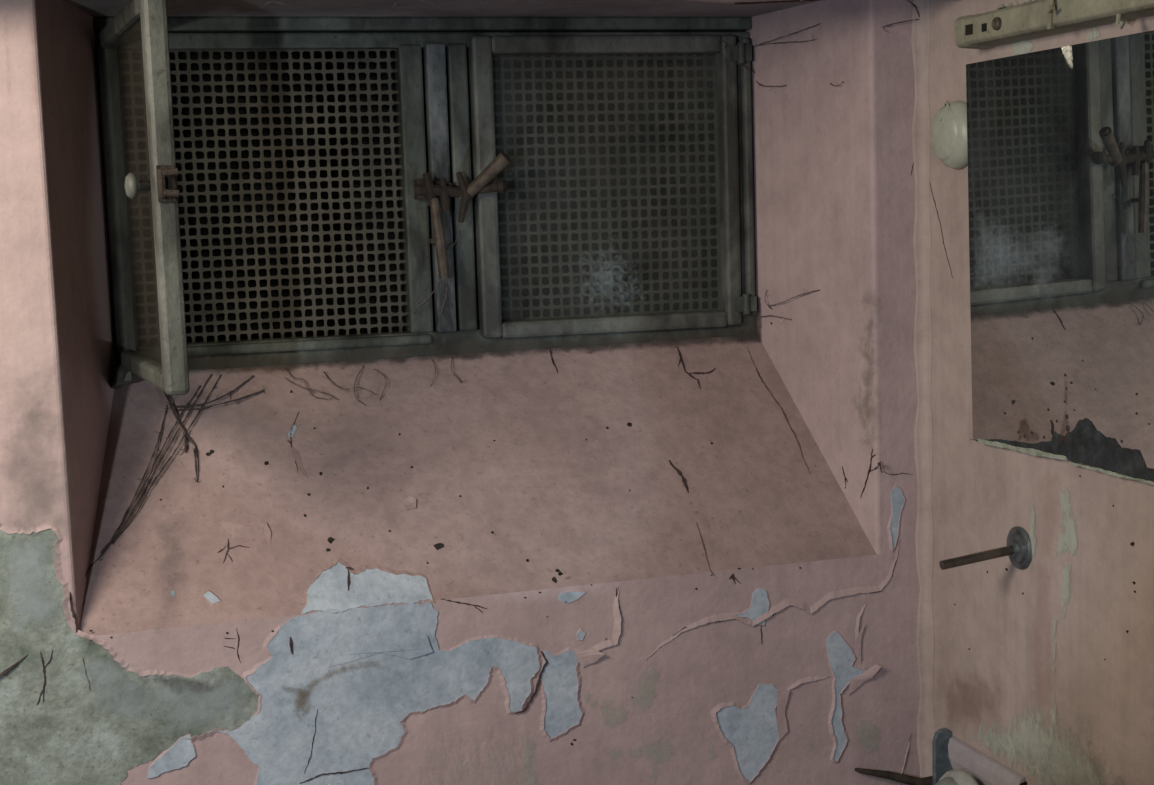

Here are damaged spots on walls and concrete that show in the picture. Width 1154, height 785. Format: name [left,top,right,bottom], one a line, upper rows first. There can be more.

peeling [0,522,621,785]
peeling [646,485,906,785]